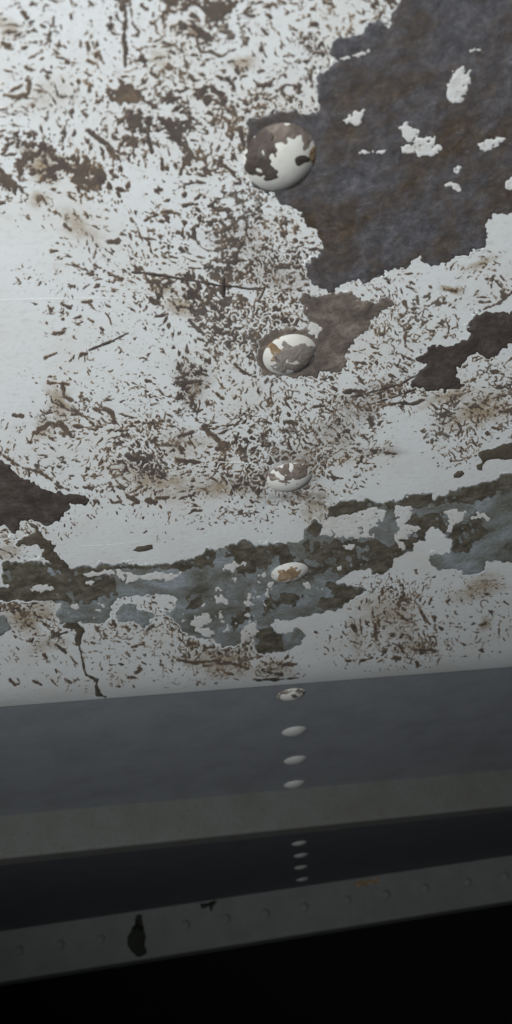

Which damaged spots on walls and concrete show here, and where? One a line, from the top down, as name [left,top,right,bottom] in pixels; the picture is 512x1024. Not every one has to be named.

crack [51,623,107,698]
peeling [0,0,512,693]